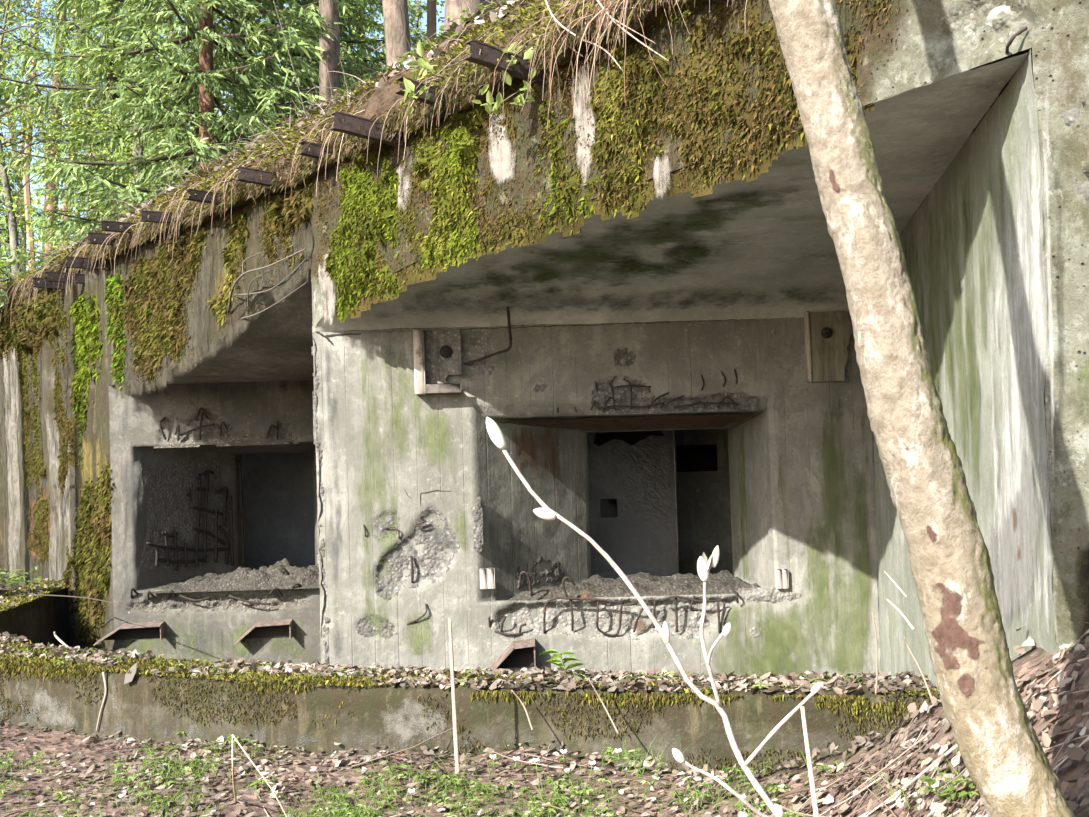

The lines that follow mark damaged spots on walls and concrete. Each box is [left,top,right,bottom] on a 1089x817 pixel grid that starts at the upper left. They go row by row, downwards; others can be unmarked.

spalling [591,347,738,412]
damp [987,183,1054,623]
spalling [140,459,245,574]
spalling [356,604,427,640]
spalling [363,505,460,603]
spalling [470,497,483,553]
spalling [488,616,526,636]
spalling [514,556,802,638]
damp [1077,548,1089,640]